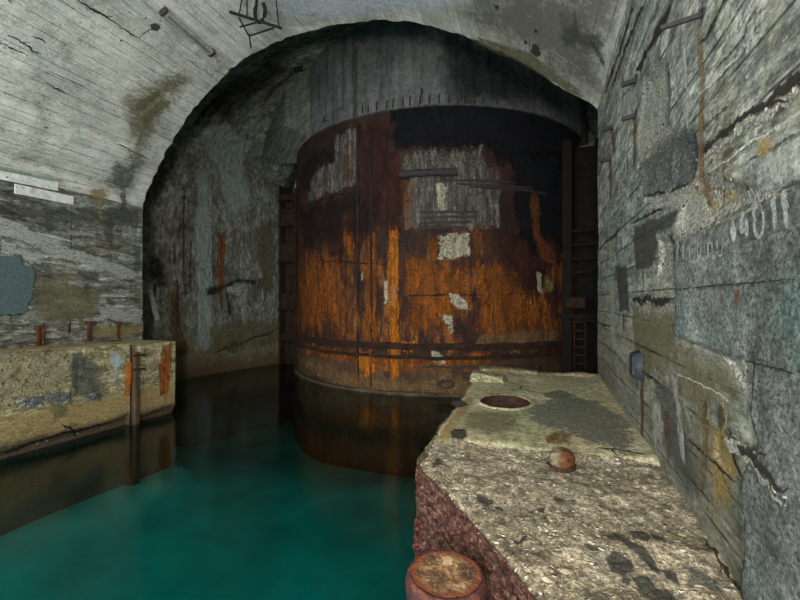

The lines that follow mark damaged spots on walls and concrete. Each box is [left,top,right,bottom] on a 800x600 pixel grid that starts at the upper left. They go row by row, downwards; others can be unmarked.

crack [78,0,152,39]
peeling [0,215,141,315]
leakage [136,91,170,125]
corrosion [158,206,192,398]
peeling [308,128,356,201]
corrosion [300,226,551,391]
peeling [354,93,580,302]
corrosion [530,193,556,264]
crack [599,71,800,250]
corrosion [697,19,712,208]
corrosion [124,361,132,396]